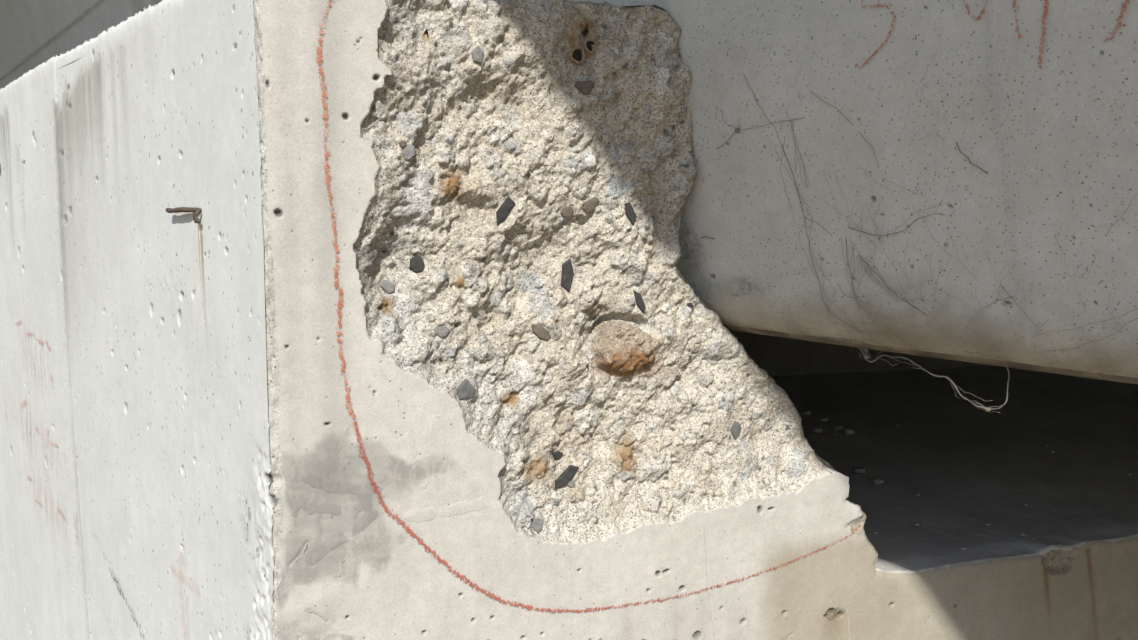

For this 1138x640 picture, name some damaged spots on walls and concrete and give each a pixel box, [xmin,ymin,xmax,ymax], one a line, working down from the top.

spalling [353,0,839,545]
rust [605,353,649,375]